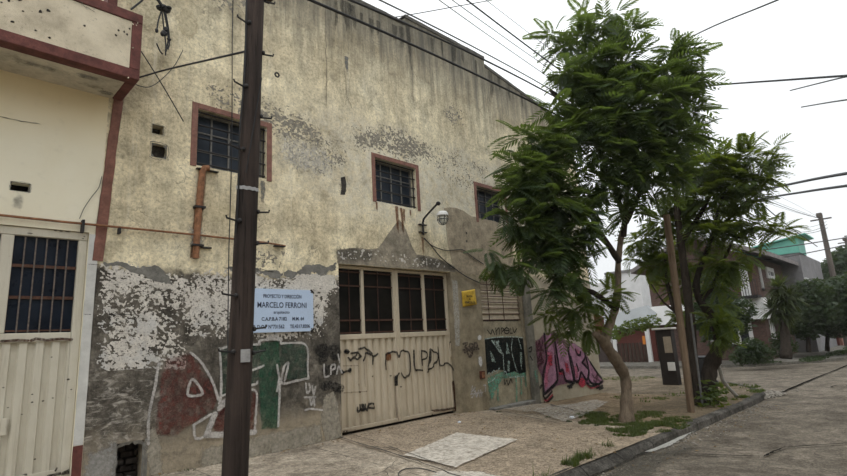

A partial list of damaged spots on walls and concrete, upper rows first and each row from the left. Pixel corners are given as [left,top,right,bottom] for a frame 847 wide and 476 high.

peeling [206,82,242,114]
peeling [261,96,488,192]
corrosion [395,206,411,232]
peeling [96,261,232,371]
peeling [253,249,452,341]